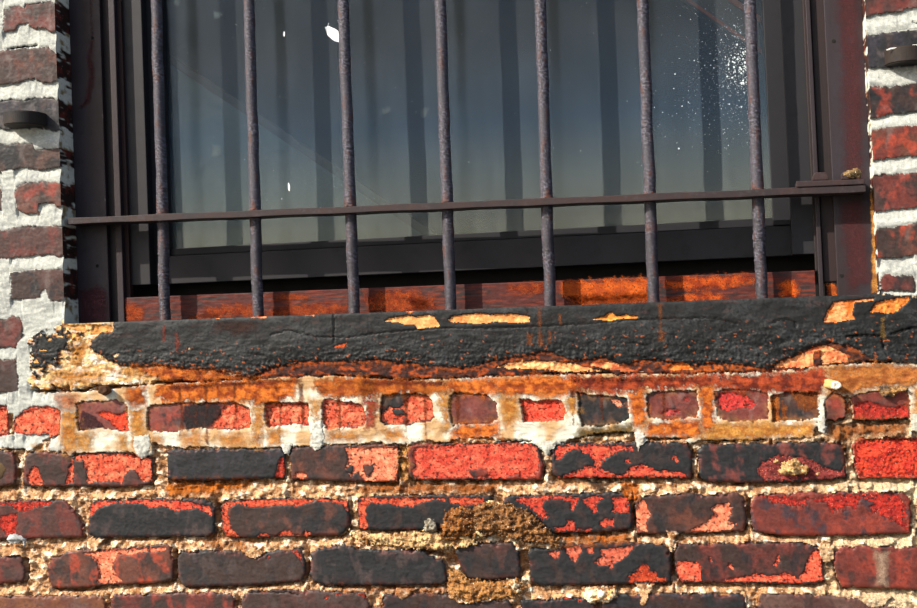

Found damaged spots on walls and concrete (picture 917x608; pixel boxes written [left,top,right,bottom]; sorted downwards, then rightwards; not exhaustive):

corrosion [561,278,648,305]
corrosion [664,275,751,302]
corrosion [189,294,346,319]
peeling [385,313,530,329]
peeling [824,297,909,323]
corrosion [55,343,101,383]
flaking render [27,319,884,394]
spalling [0,407,61,438]
spalling [381,395,434,425]
corrosion [118,361,917,494]
spalling [520,400,565,422]
corrosion [166,479,253,497]